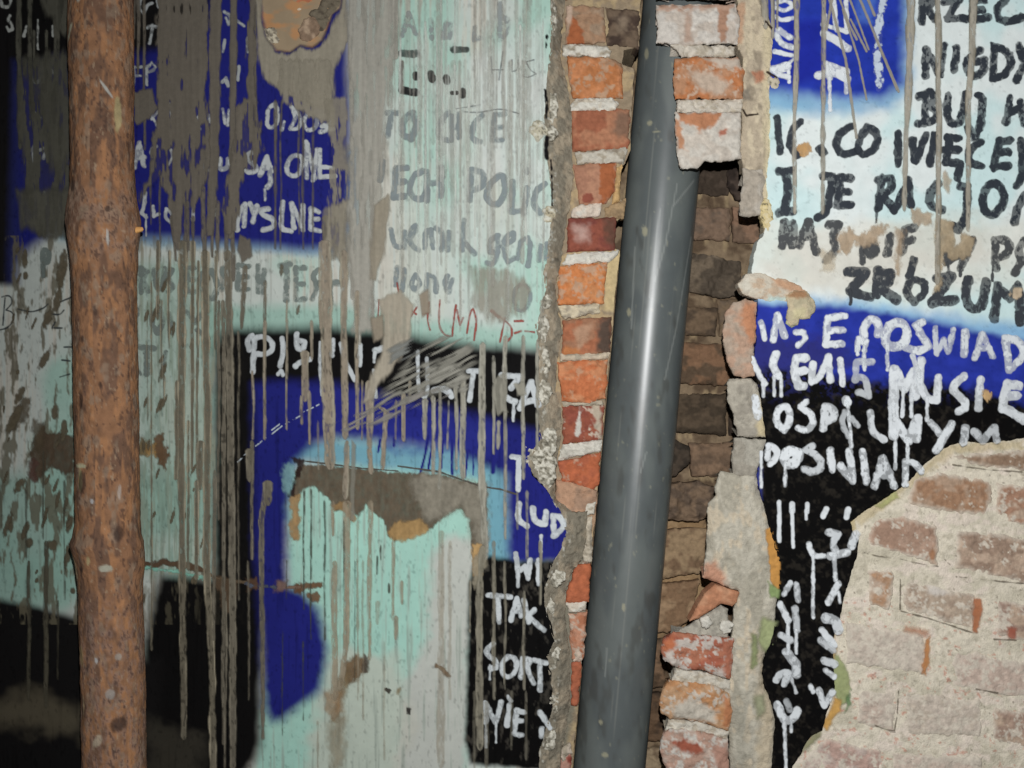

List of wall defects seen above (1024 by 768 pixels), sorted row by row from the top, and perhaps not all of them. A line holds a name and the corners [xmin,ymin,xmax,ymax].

flaking render [296,0,340,42]
flaking render [734,0,780,234]
leakage [822,224,903,275]
leakage [911,209,974,292]
spalling [526,0,641,768]
peeling [283,458,489,585]
flaking render [700,299,781,768]
flaking render [792,437,1024,768]